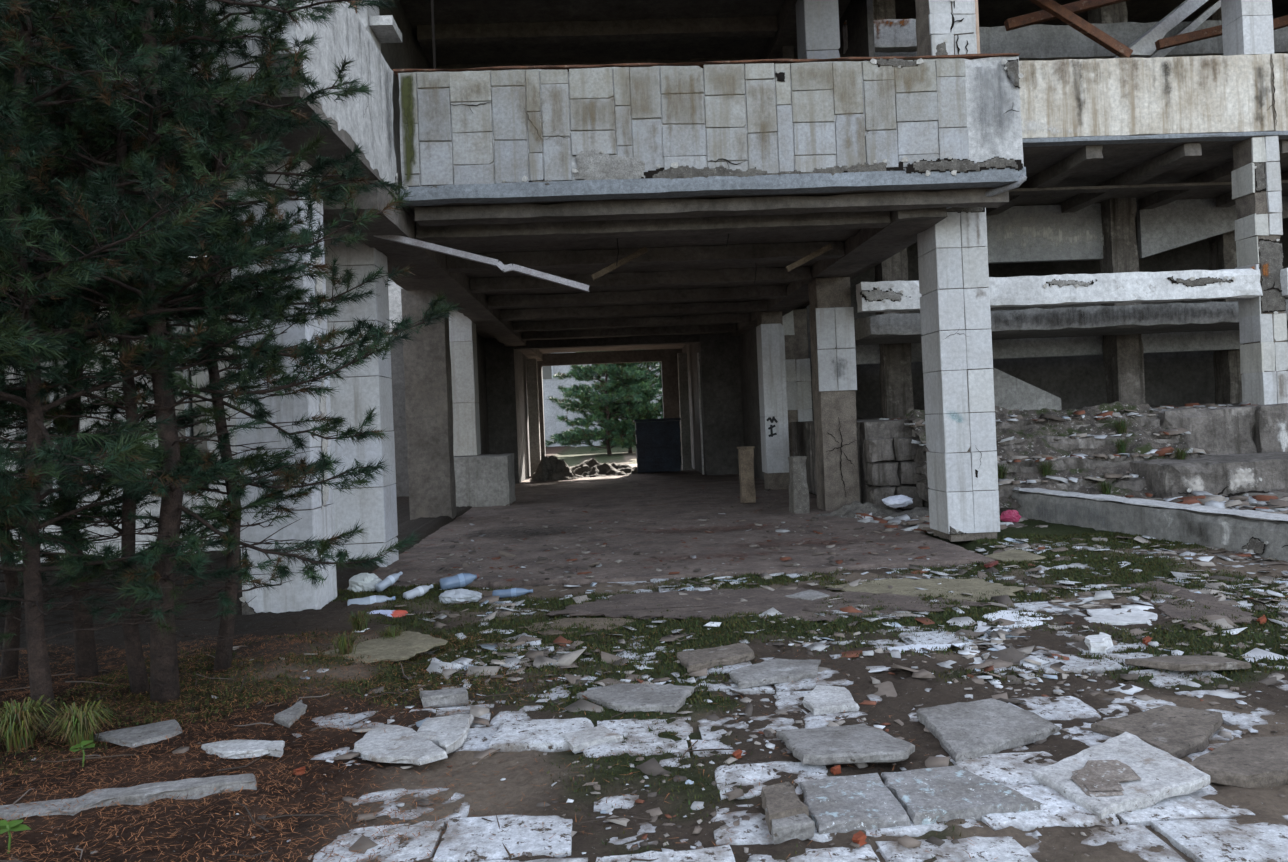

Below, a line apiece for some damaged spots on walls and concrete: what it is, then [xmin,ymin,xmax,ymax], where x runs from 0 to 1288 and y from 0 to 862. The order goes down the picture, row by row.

crack [950,1,968,55]
spalling [572,149,1023,180]
peeling [860,287,910,303]
peeling [1043,279,1097,288]
peeling [1167,276,1236,287]
spalling [1257,239,1286,315]
crack [827,417,857,493]